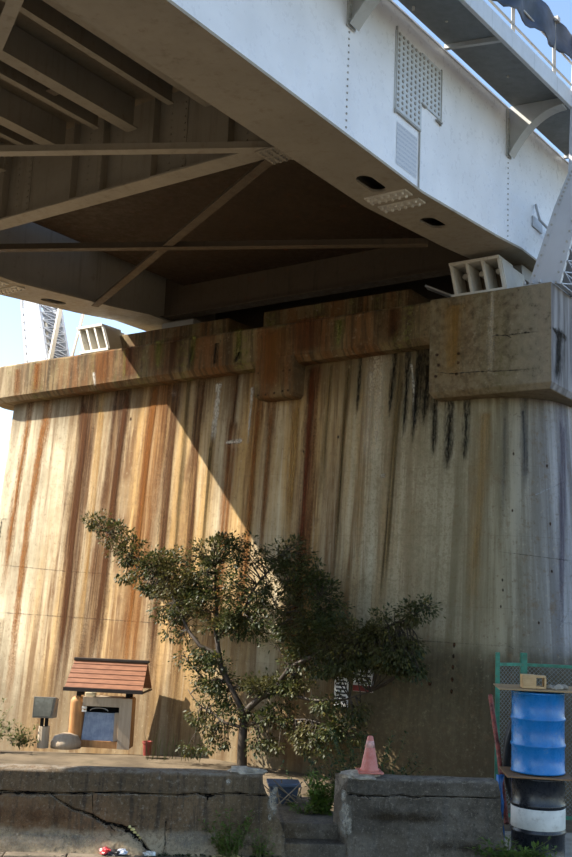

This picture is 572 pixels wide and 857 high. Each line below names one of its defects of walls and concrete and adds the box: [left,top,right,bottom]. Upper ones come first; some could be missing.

corrosion [6,400,51,660]
corrosion [56,395,94,667]
corrosion [80,389,131,658]
corrosion [123,383,215,663]
corrosion [219,375,238,552]
corrosion [243,389,289,583]
corrosion [288,367,321,670]
damp [389,349,470,462]
crack [0,790,265,851]